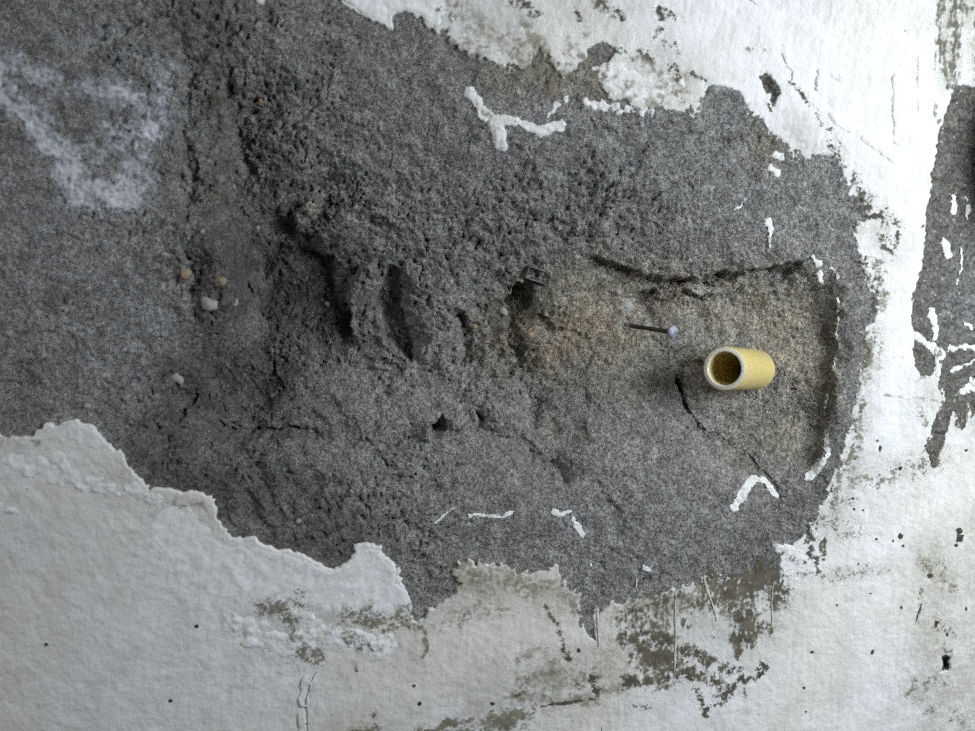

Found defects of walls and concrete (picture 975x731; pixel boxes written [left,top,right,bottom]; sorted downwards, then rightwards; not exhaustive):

damp [935,0,975,90]
spalling [0,0,880,640]
damp [861,328,882,382]
peeling [911,85,975,469]
crack [677,379,789,510]
damp [254,592,325,665]
damp [341,605,429,659]
damp [417,399,945,731]